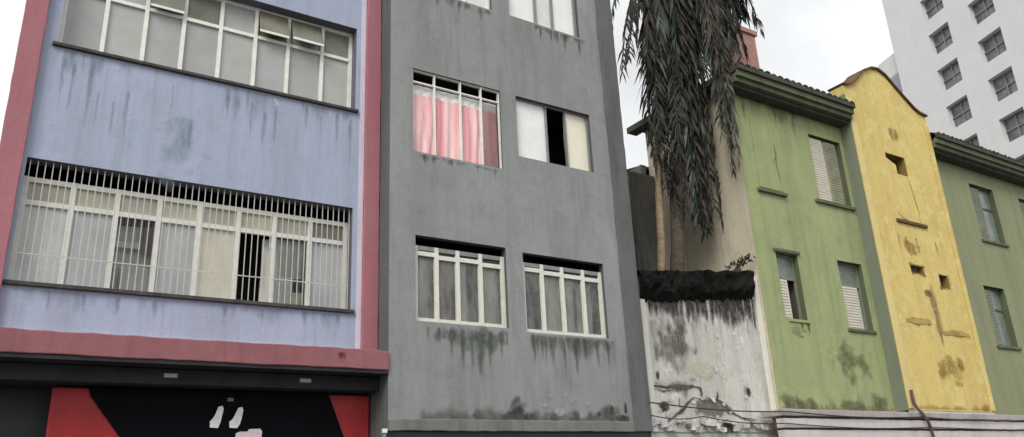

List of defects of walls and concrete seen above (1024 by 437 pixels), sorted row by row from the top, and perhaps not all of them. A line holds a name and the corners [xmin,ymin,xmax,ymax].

leakage [438,329,507,365]
leakage [531,335,610,360]
leakage [656,322,696,358]
leakage [503,398,535,420]
flaking render [692,397,741,433]